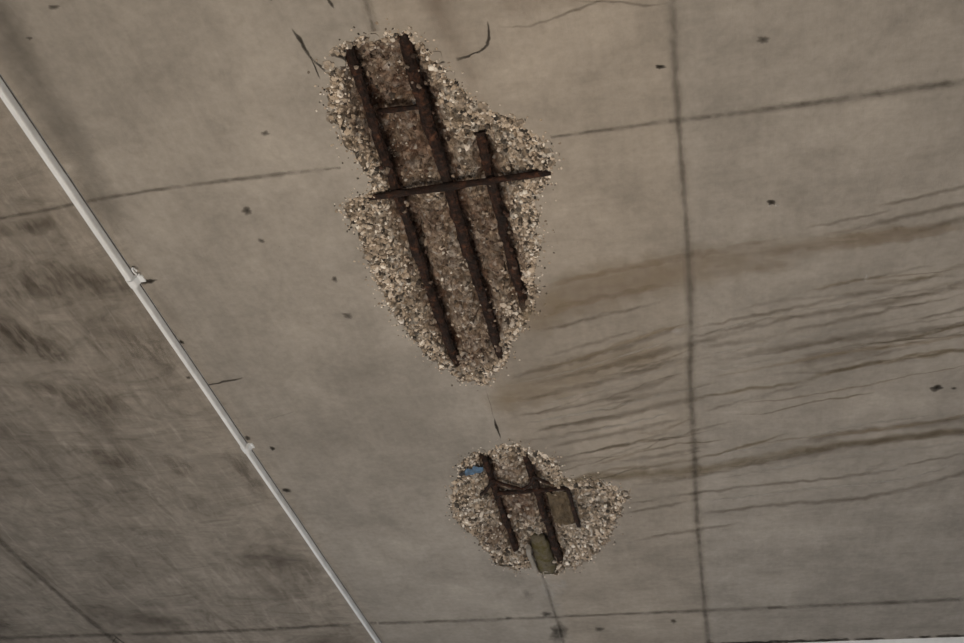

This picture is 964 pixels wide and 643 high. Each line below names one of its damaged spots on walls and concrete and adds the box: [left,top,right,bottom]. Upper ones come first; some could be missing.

spalling [314,19,564,391]
spalling [445,439,632,578]